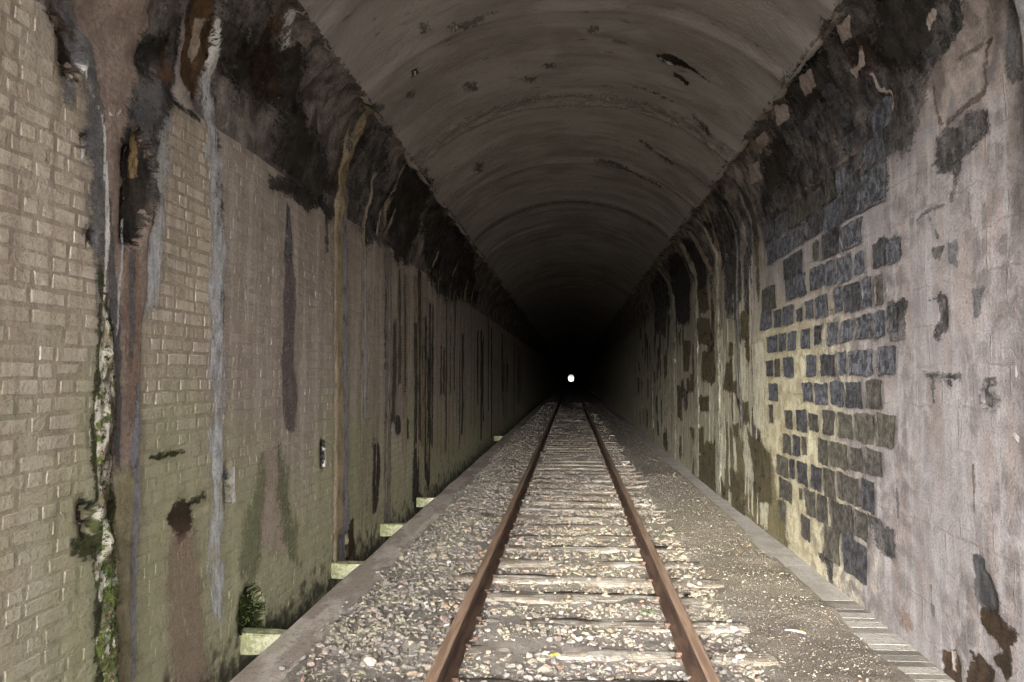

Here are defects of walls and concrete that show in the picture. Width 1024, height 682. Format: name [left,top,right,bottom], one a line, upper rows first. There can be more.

water stain [145,112,175,322]
rust [170,0,222,114]
water stain [167,0,274,624]
water stain [282,204,298,432]
water stain [270,105,336,252]
water stain [345,94,769,557]
peeling [635,14,909,586]
peeling [926,0,964,46]
peeling [933,106,991,202]
peeling [942,554,1019,682]